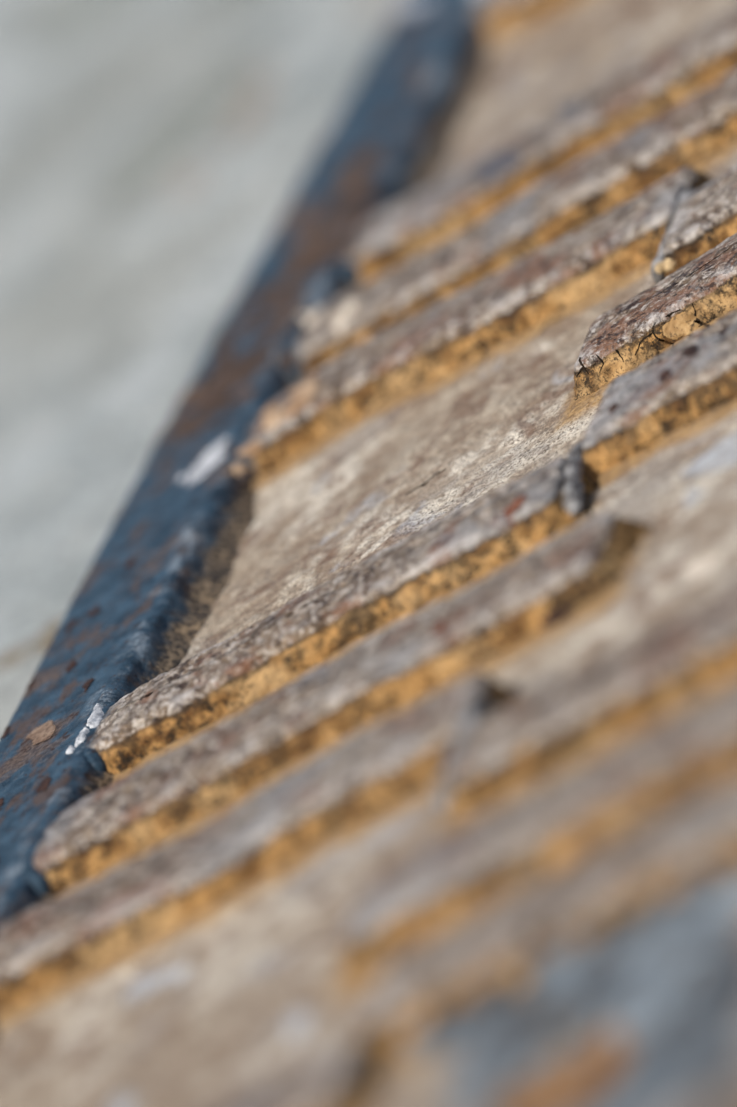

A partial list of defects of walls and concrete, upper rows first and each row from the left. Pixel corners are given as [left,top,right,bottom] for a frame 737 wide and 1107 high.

rust [25,720,55,745]